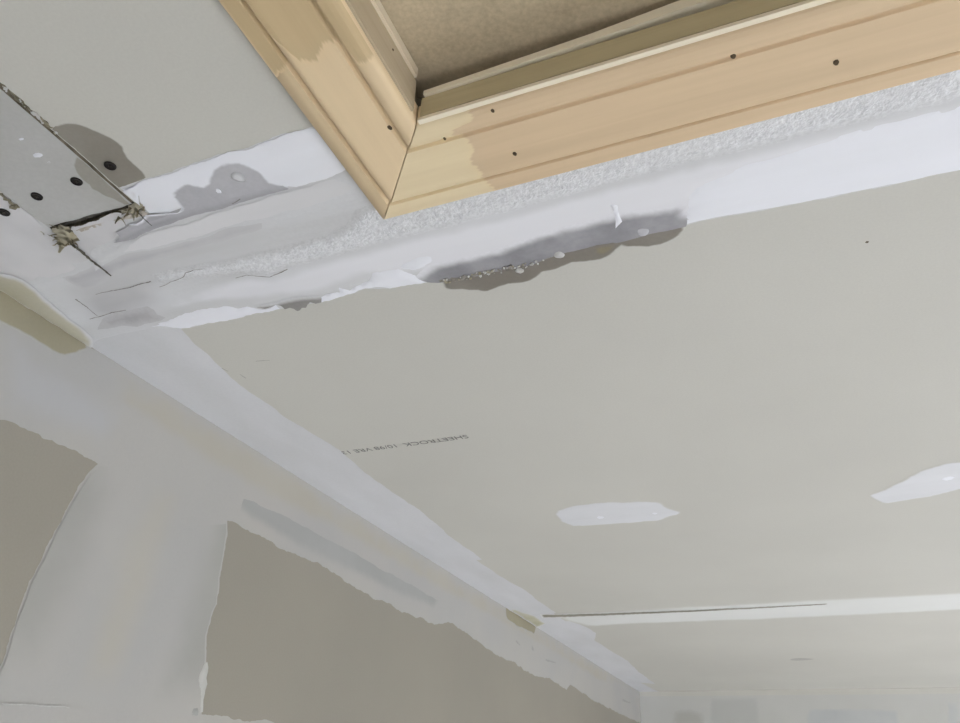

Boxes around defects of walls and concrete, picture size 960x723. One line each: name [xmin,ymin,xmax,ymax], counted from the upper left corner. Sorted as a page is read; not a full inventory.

spalling [0,83,58,135]
water stain [52,122,146,205]
water stain [114,162,288,243]
crack [56,202,200,319]
water stain [415,203,688,292]